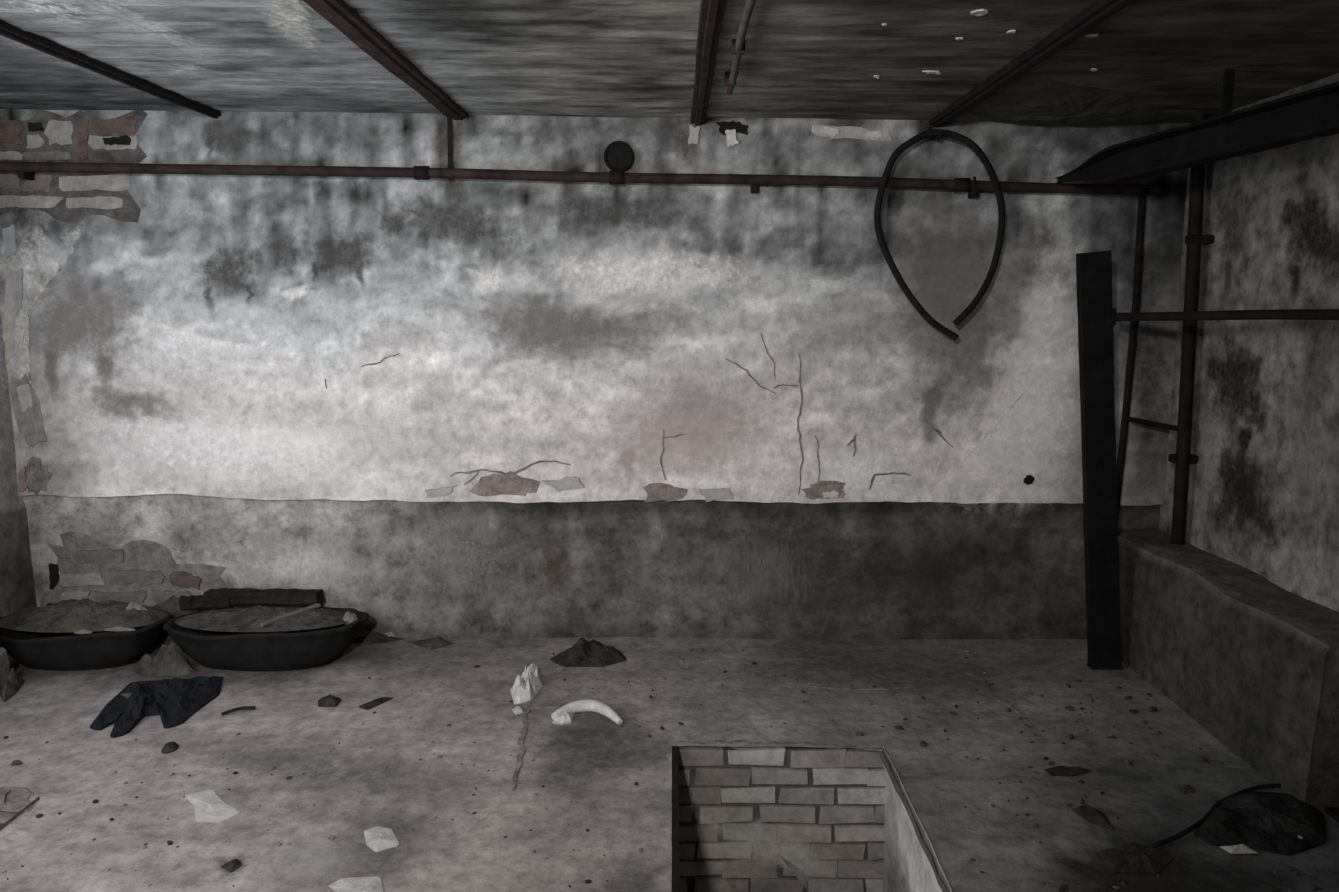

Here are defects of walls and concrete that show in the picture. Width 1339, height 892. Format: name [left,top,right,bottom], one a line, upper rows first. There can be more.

flaking render [0,110,148,495]
damp [0,231,273,423]
damp [283,286,308,300]
damp [273,235,369,281]
damp [485,252,746,352]
damp [908,231,1076,486]
damp [1282,199,1339,295]
damp [101,394,367,483]
flaking render [425,471,585,498]
crack [726,334,910,494]
damp [819,453,903,492]
damp [1200,347,1274,537]